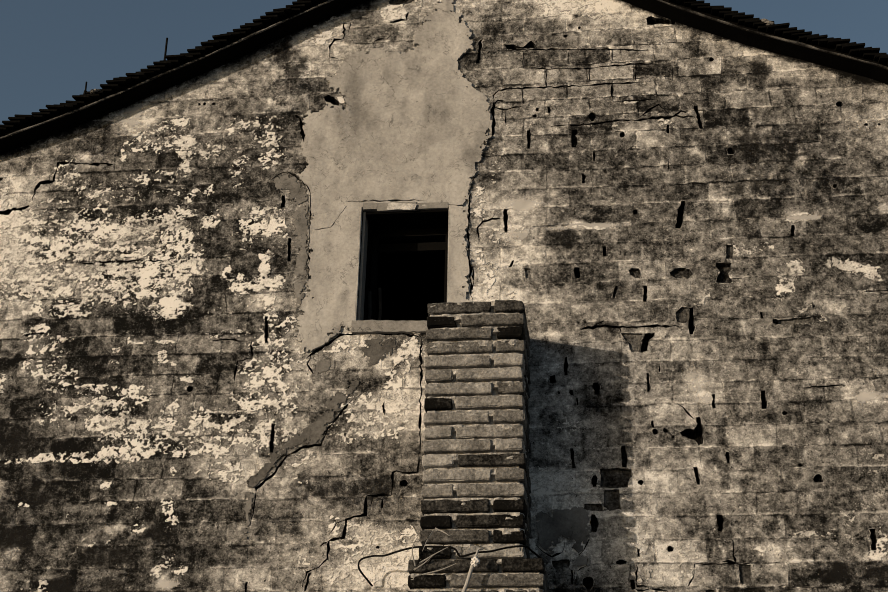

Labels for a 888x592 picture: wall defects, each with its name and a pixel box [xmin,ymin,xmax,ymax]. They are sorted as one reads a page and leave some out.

crack [490,100,504,136]
water stain [738,128,828,186]
crack [0,161,113,215]
water stain [549,207,631,248]
peeling [824,257,884,282]
peeling [328,333,423,444]
water stain [56,460,93,474]
peeling [161,497,179,530]
crack [250,394,361,525]
water stain [291,473,394,514]
crack [302,333,423,587]
spalling [530,466,643,520]